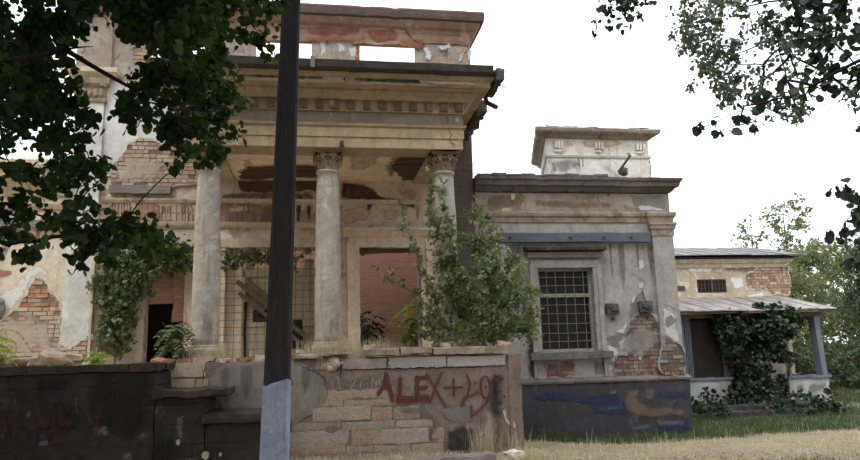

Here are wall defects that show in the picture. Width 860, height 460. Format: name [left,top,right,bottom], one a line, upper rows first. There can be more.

peeling [337,42,357,57]
spalling [110,136,198,188]
spalling [108,196,193,222]
spalling [730,265,792,297]
spalling [0,266,123,361]
spalling [604,282,686,377]